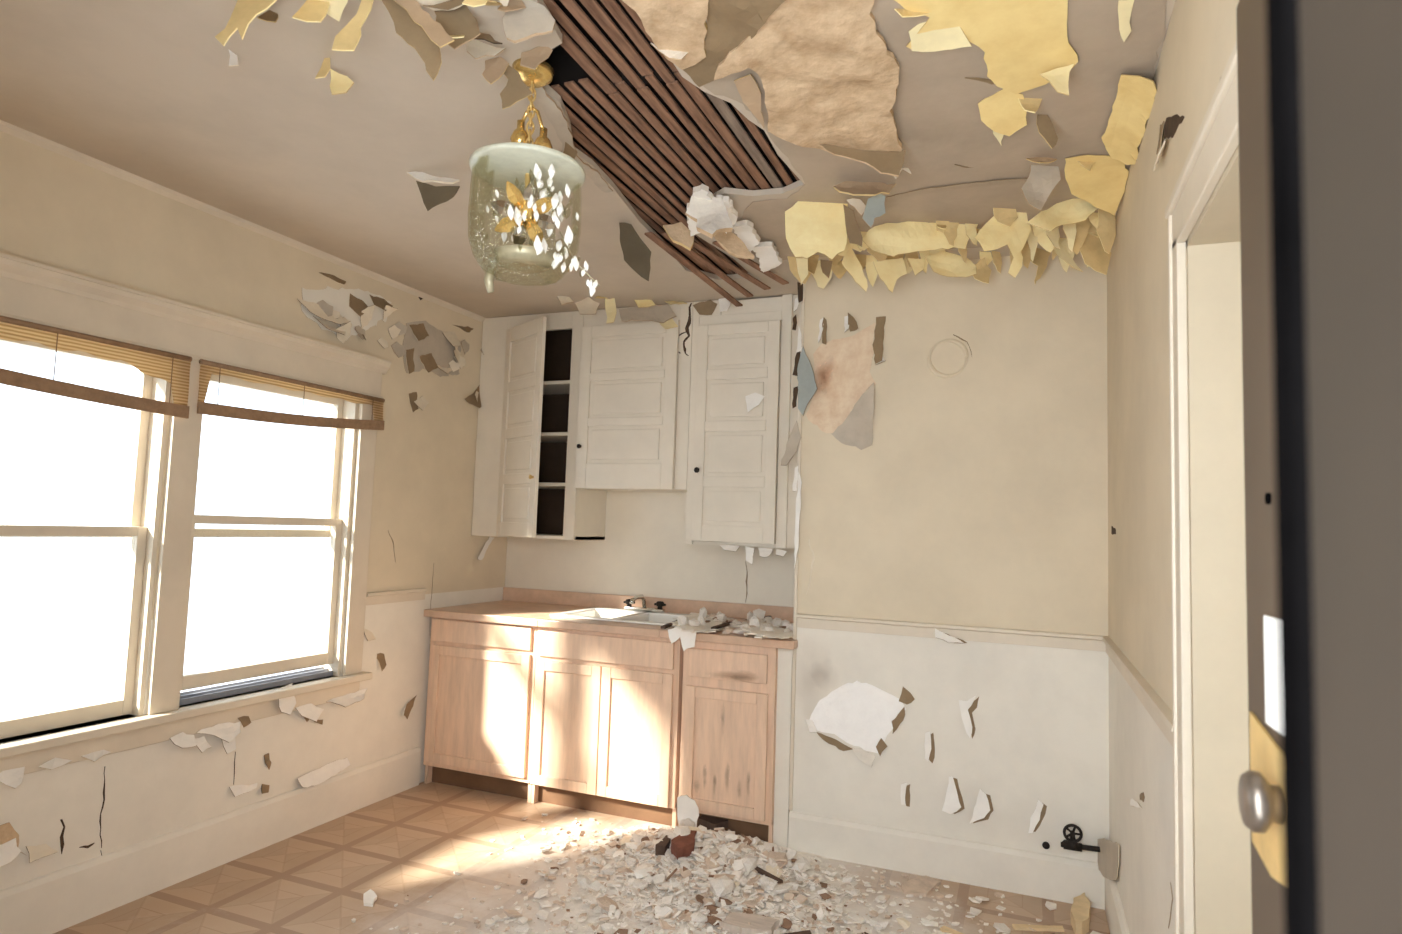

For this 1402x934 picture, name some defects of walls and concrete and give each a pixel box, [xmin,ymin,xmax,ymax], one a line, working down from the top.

peeling [215,0,374,95]
peeling [407,171,460,211]
peeling [298,272,484,377]
peeling [533,0,1185,602]
peeling [464,384,481,408]
peeling [170,716,251,754]
peeling [278,683,367,725]
spalling [805,680,915,767]
peeling [959,695,979,738]
peeling [229,753,271,797]
crack [60,767,105,856]
peeling [942,776,993,824]